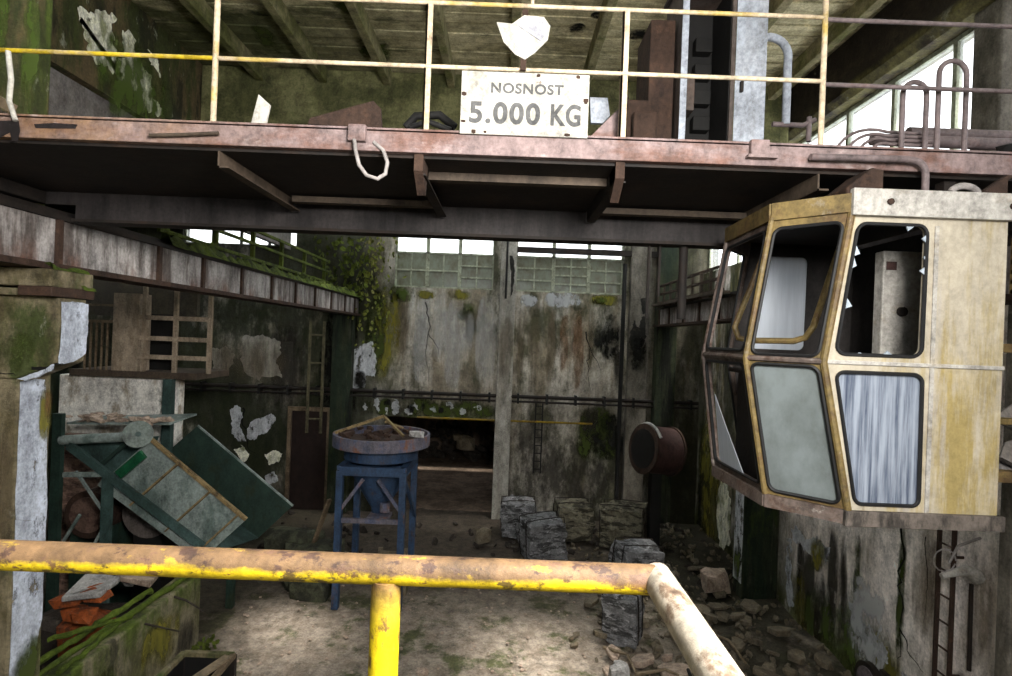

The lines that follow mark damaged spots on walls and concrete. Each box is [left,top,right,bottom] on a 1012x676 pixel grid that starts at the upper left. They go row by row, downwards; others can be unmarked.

water stain [20,0,40,94]
peeling [77,6,166,119]
water stain [521,293,580,307]
peeling [212,334,282,380]
mould [594,314,620,379]
peeling [15,302,89,541]
peeling [230,405,282,484]
mould [577,407,624,462]
peeling [9,571,44,676]
water stain [793,531,899,676]
water stain [973,581,989,654]